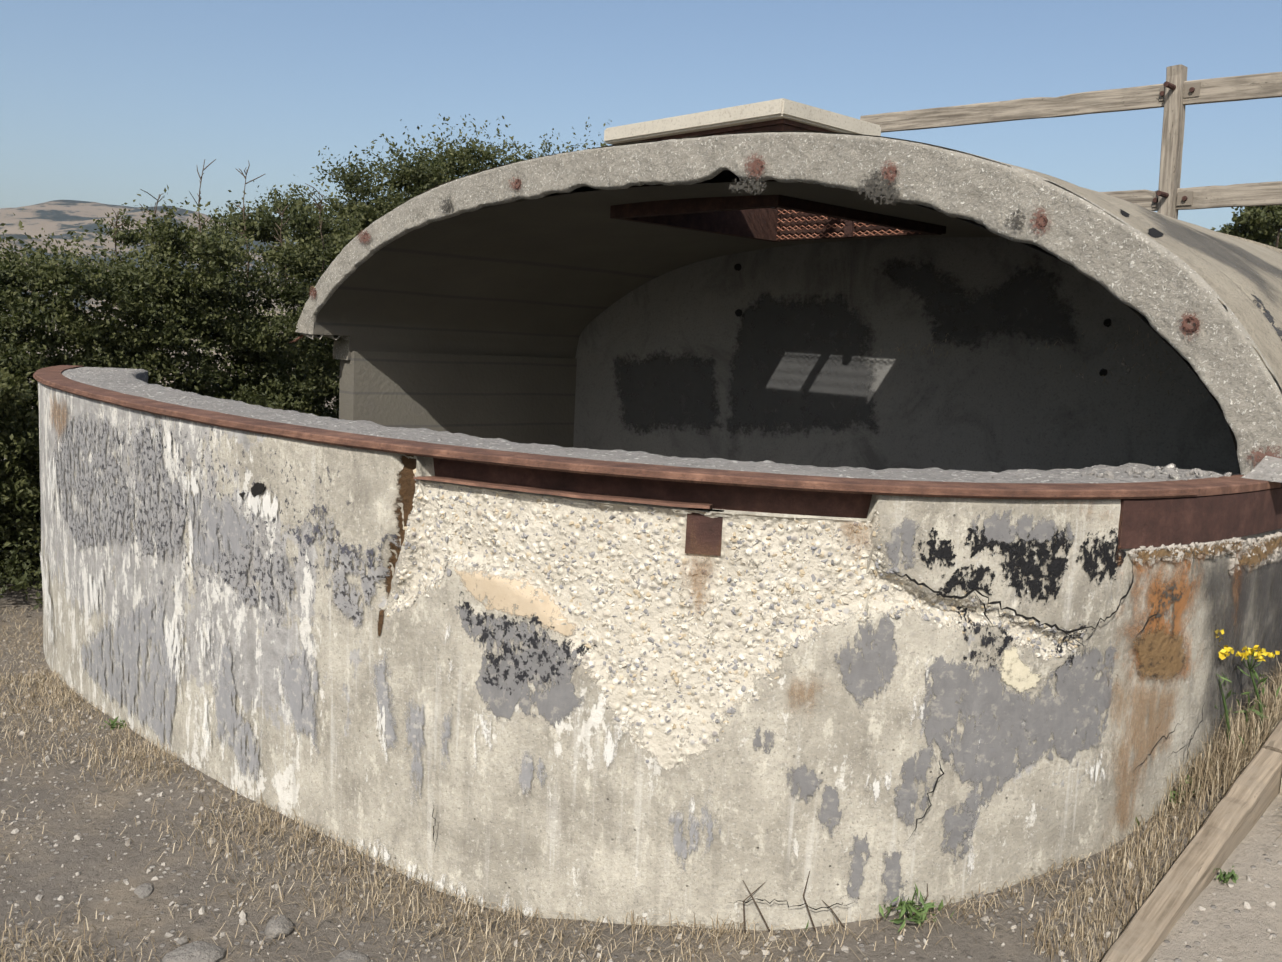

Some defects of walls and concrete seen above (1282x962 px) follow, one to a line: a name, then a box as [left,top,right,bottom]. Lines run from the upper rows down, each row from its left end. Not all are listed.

rust [744,153,767,177]
rust [1030,208,1052,235]
rust [1177,310,1201,340]
peeling [52,412,190,563]
spalling [237,491,281,521]
spalling [296,469,1086,770]
crack [888,563,1158,646]
rust [1128,559,1204,677]